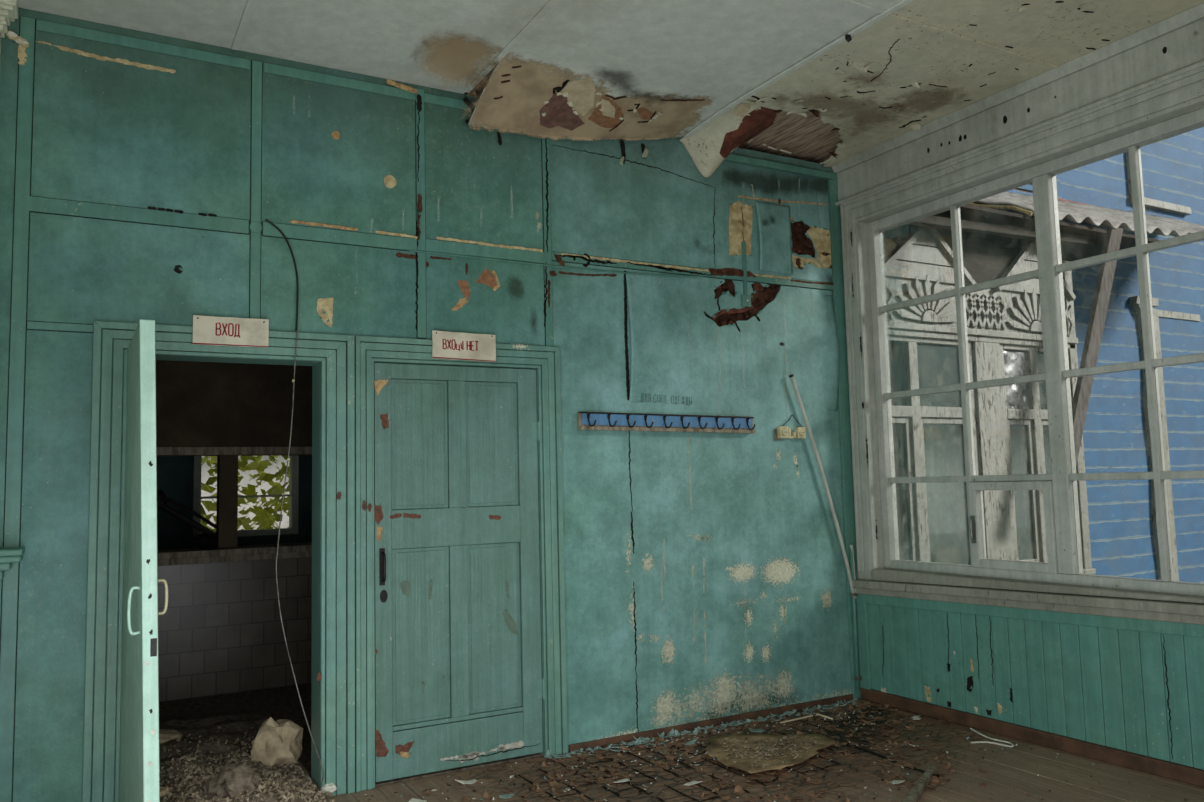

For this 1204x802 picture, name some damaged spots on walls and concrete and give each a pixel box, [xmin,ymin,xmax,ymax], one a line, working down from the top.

peeling [0,30,176,73]
water stain [427,37,712,141]
peeling [540,78,705,166]
crack [743,39,1019,130]
crack [1018,1,1110,50]
peeling [317,298,333,327]
peeling [452,269,500,311]
spalling [560,195,833,332]
peeling [362,500,421,540]
crack [519,431,910,802]
peeling [456,554,957,802]
peeling [375,728,414,758]